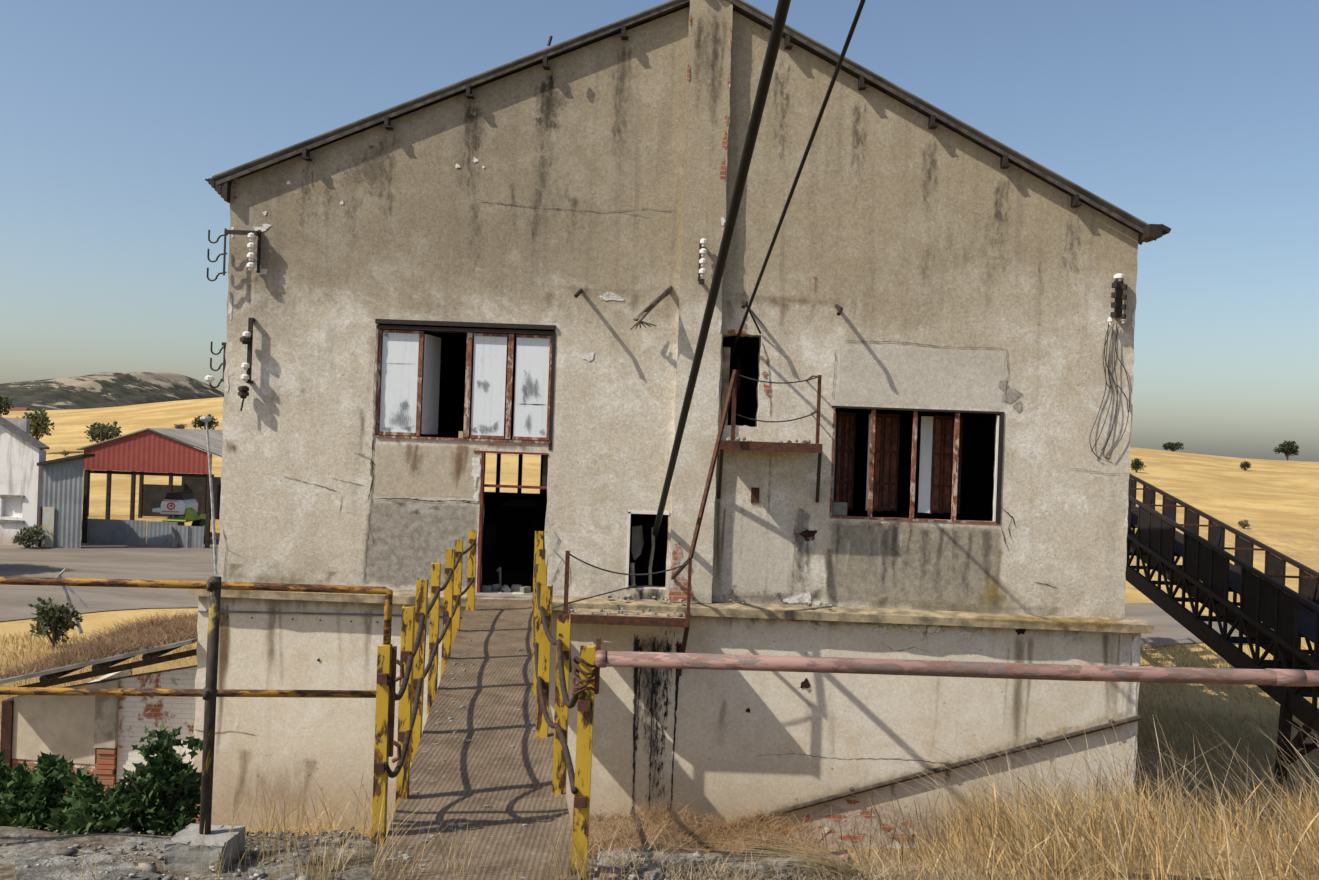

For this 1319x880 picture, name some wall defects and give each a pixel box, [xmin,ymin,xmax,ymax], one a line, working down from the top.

crack [482,201,673,217]
leakage [631,627,681,832]
flaking render [755,799,942,849]